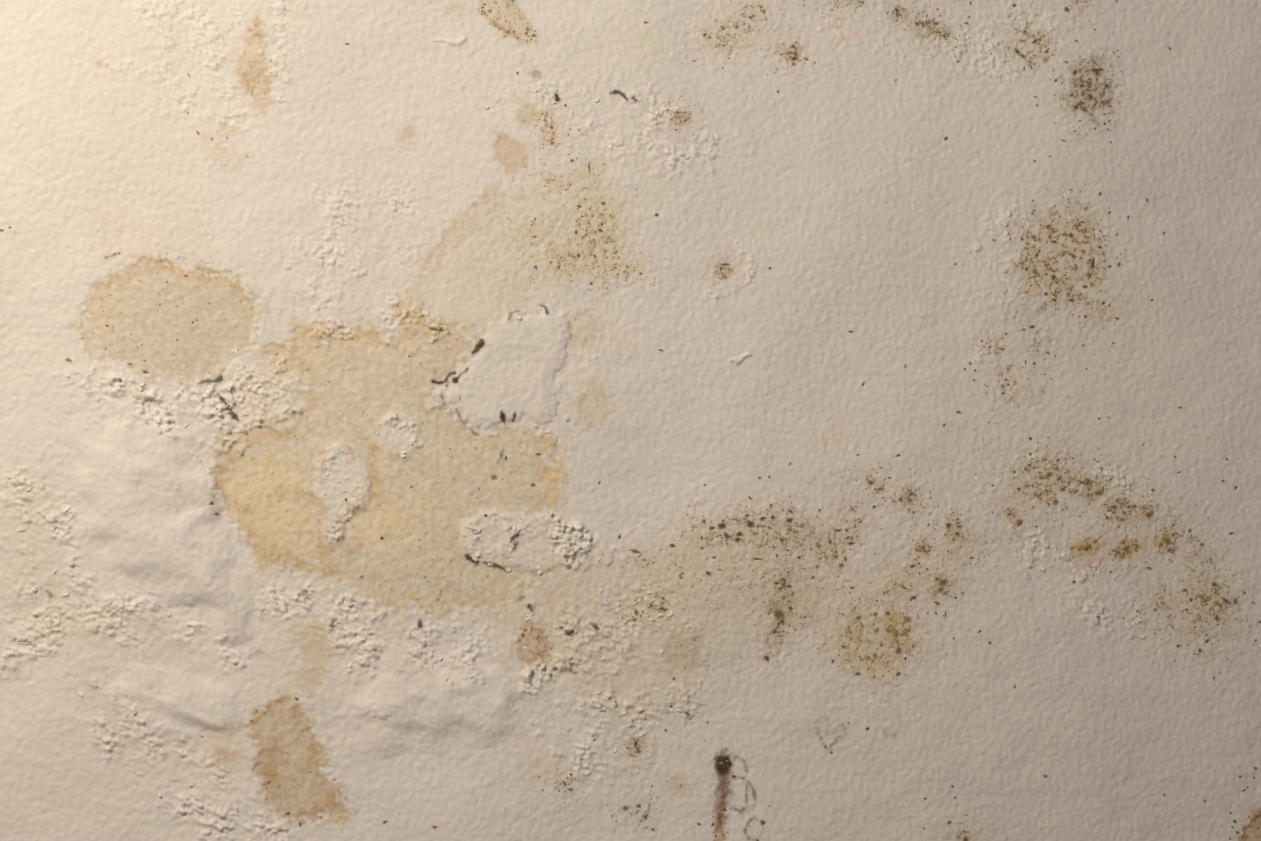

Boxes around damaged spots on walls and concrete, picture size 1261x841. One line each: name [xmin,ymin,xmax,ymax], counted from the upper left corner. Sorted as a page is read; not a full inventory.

leakage [406,0,540,47]
leakage [677,0,991,93]
leakage [989,0,1131,143]
leakage [389,65,668,357]
leakage [213,334,322,454]
leakage [477,183,1261,841]